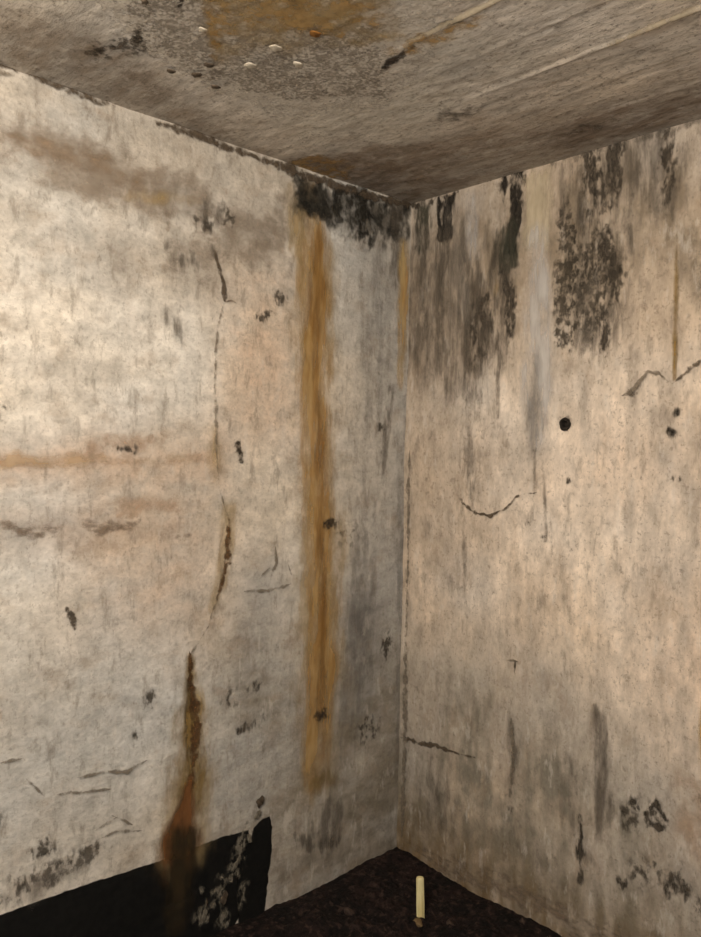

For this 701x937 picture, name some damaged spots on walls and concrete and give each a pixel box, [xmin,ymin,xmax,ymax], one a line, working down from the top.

damp [644,128,677,204]
damp [296,140,641,408]
crack [622,360,701,396]
corrosion [291,210,337,787]
crack [462,493,534,518]
corrosion [161,652,206,930]
mould [16,838,99,895]
mould [616,866,648,889]
mould [653,861,700,901]